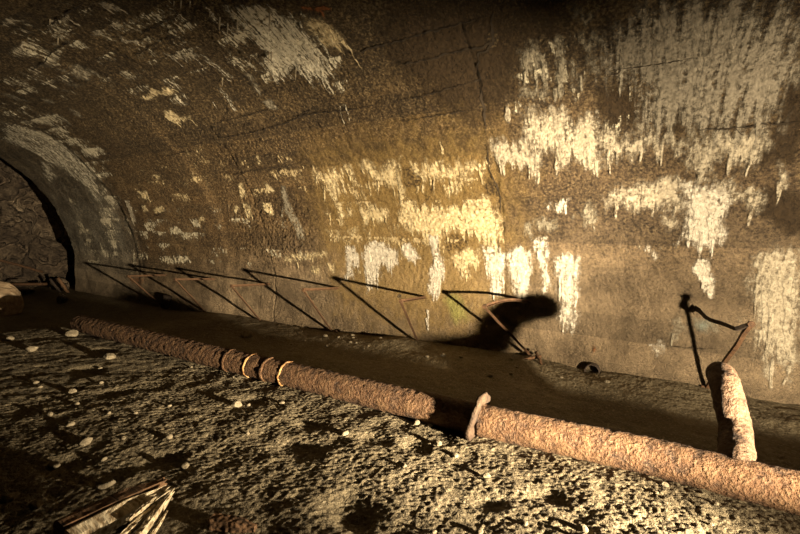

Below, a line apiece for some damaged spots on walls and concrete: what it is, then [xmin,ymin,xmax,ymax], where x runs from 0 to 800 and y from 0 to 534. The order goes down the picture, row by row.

damp [206,4,359,90]
crack [487,146,501,213]
damp [303,0,800,333]
damp [748,249,800,389]